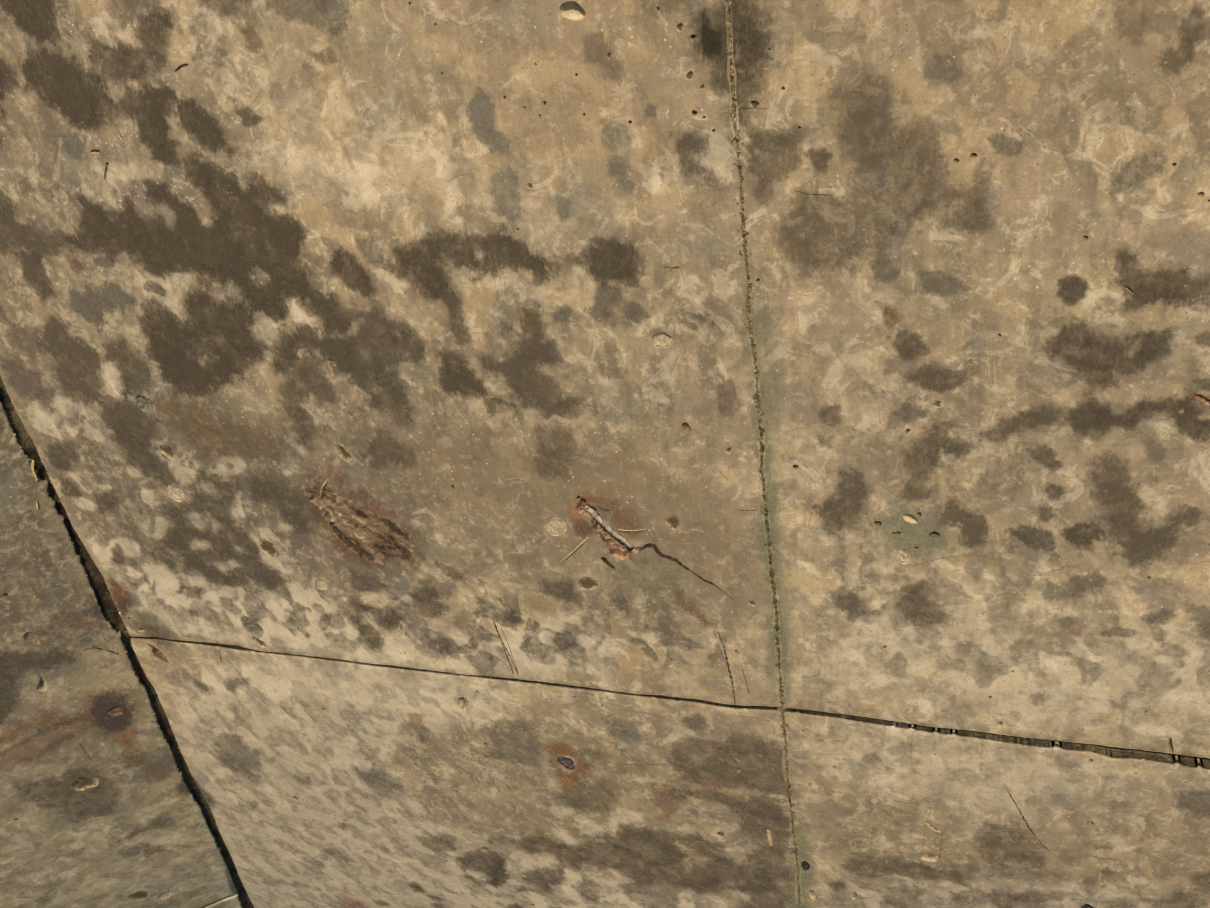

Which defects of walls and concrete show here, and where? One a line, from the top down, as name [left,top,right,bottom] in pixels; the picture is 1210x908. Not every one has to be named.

damp [0,0,424,483]
damp [386,227,552,343]
damp [1058,276,1087,304]
damp [440,306,576,416]
damp [1070,397,1210,440]
damp [151,472,281,609]
spalling [308,481,415,565]
crack [601,557,615,569]
crack [639,543,737,602]
damp [1009,459,1199,564]
rust [0,694,135,762]
rust [547,743,589,787]